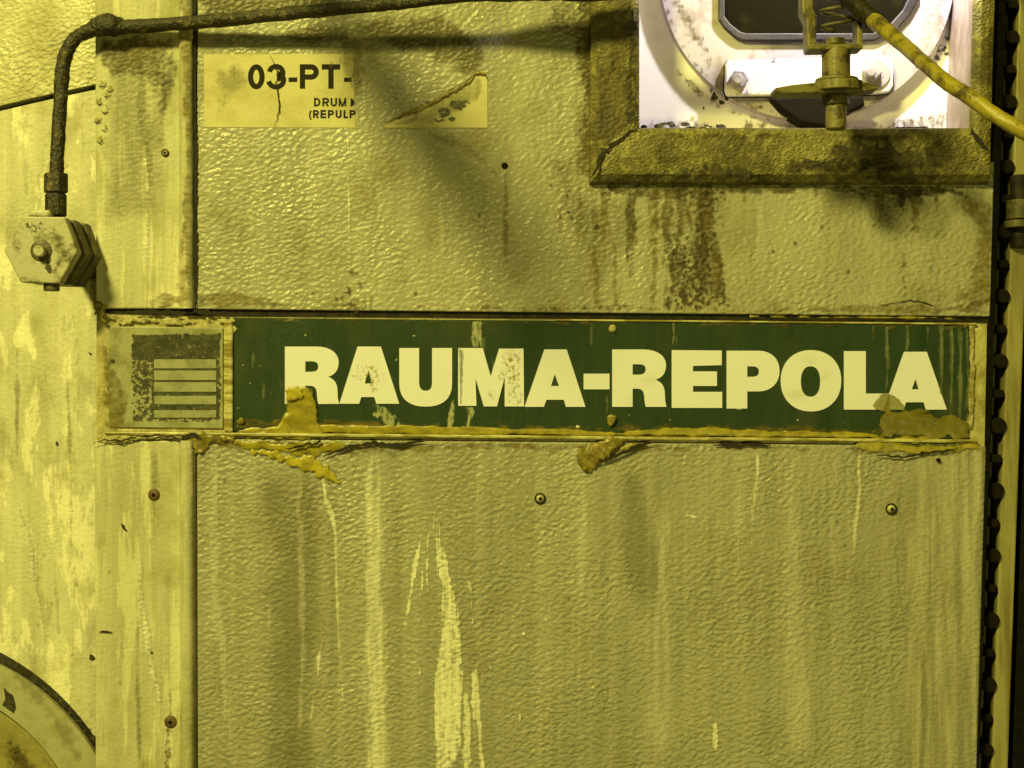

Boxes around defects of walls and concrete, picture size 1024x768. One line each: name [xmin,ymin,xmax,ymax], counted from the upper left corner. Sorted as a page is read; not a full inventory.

crack [270,56,280,126]
crack [591,129,638,177]
damp [404,519,491,768]
peeling [1,660,96,744]